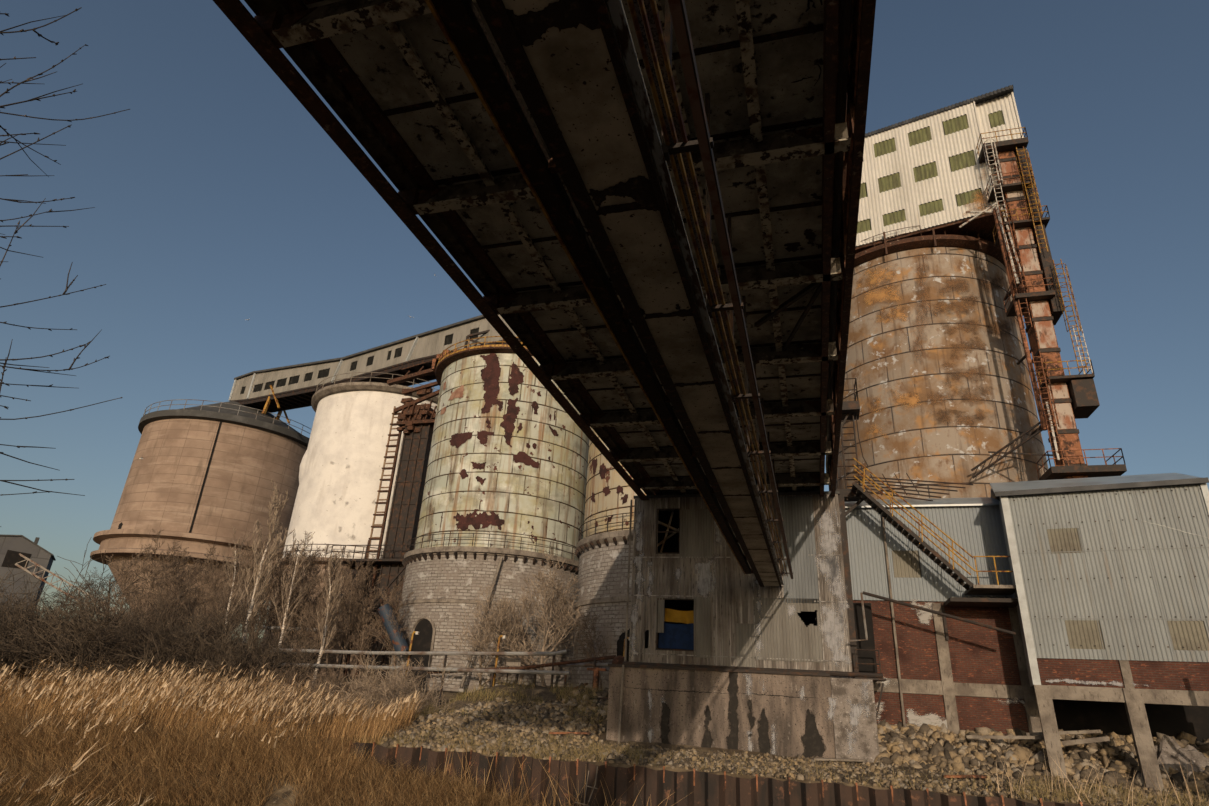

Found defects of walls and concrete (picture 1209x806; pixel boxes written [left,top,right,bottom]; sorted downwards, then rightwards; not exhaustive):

spalling [506,0,609,47]
peeling [440,382,464,415]
peeling [450,353,559,468]
peeling [459,462,486,485]
peeling [591,458,628,522]
peeling [453,509,505,533]
leakage [648,691,670,744]
leakage [701,672,775,754]